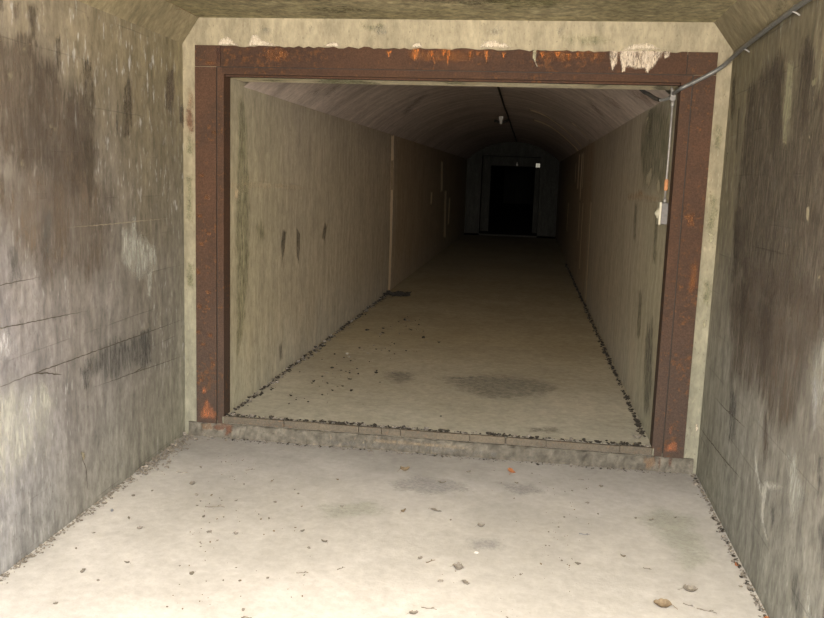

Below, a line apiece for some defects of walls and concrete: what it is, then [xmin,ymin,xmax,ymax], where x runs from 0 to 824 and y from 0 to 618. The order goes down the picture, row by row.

water stain [249,35,273,46]
water stain [611,43,670,72]
water stain [116,81,132,137]
water stain [0,6,110,278]
water stain [730,38,824,533]
crack [0,311,86,329]
crack [1,322,175,387]